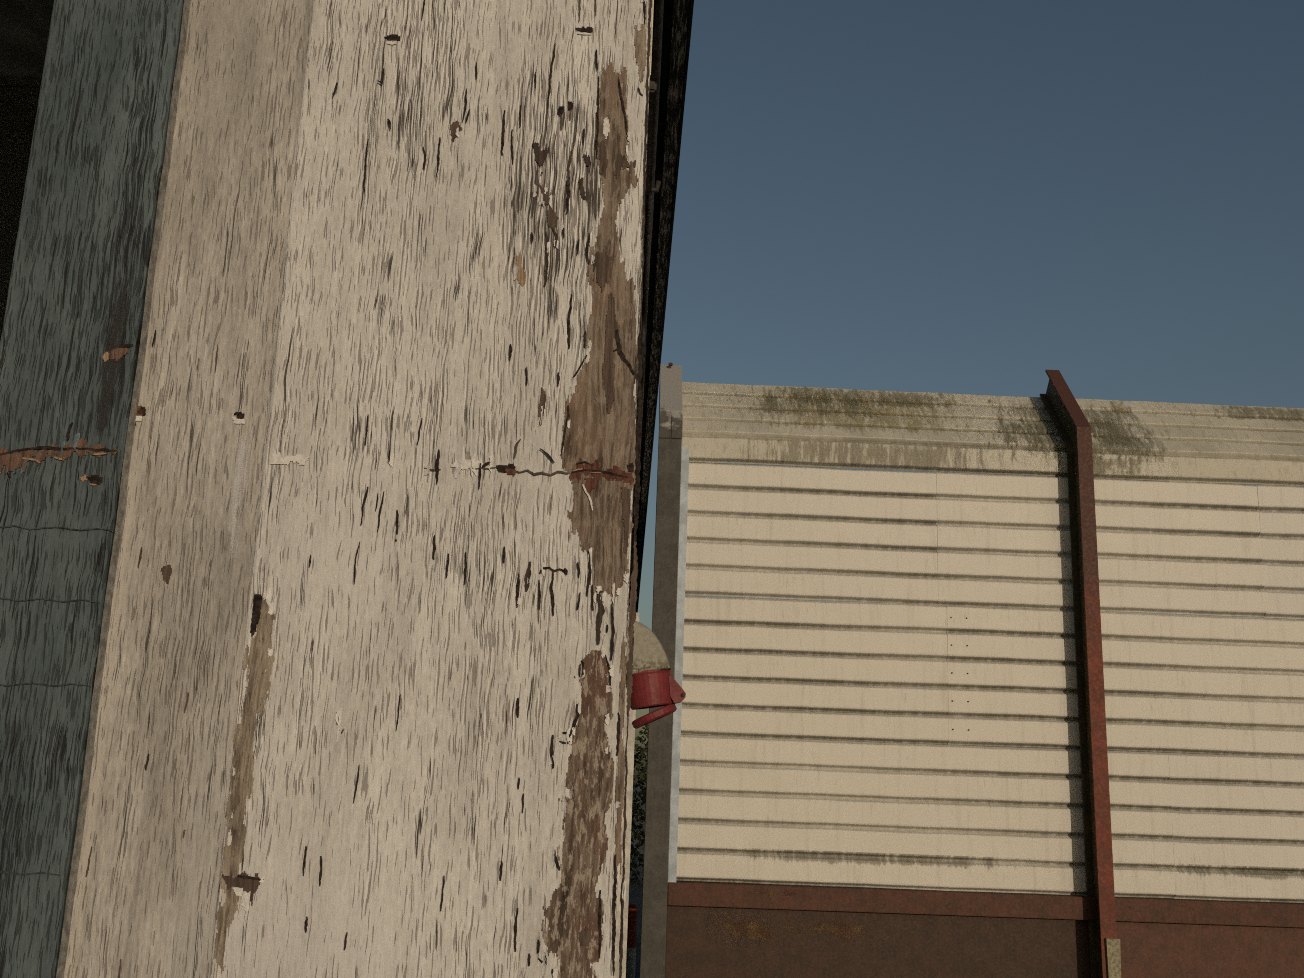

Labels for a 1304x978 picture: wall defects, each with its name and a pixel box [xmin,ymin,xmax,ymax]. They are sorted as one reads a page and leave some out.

crack [363,119,391,193]
crack [423,62,477,176]
peeling [514,254,526,286]
crack [472,43,592,489]
crack [354,414,440,584]
crack [432,535,467,584]
peeling [516,0,647,978]
peeling [213,585,275,978]